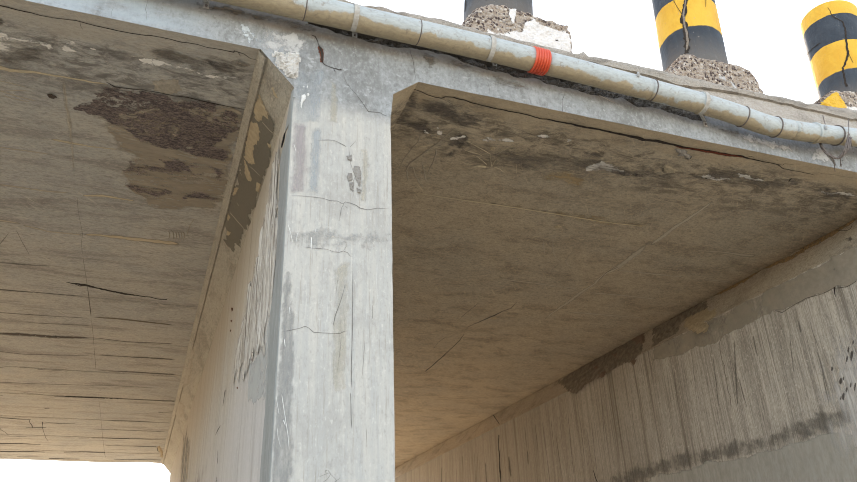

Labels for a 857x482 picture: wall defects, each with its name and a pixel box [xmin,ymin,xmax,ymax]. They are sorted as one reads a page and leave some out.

water stain [0,19,77,63]
water stain [139,50,247,79]
water stain [212,6,269,19]
spalling [240,24,305,79]
crack [312,35,386,116]
crack [674,0,706,54]
crack [828,8,853,86]
crack [411,55,851,178]
spalling [73,87,280,383]
crack [66,282,167,300]
crack [426,305,514,371]
water stain [613,323,857,482]